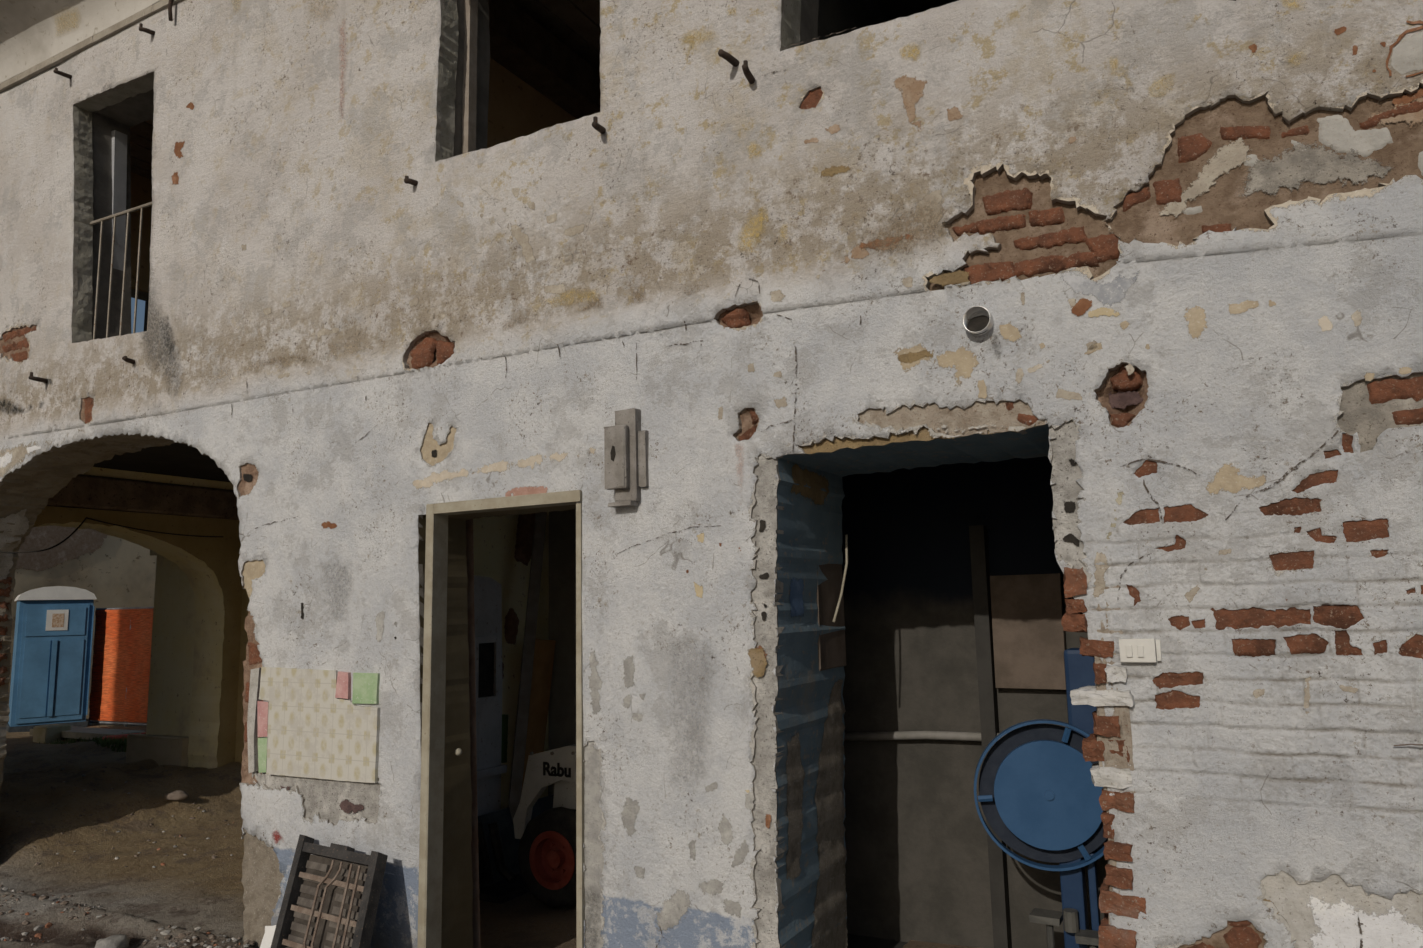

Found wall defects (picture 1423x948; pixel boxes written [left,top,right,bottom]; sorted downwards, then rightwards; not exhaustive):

flaking render [799,86,825,110]
peeling [892,75,927,132]
flaking render [901,79,1423,332]
flaking render [402,314,455,372]
flaking render [717,289,786,331]
flaking render [1259,367,1423,577]
peeling [0,508,107,686]
spalling [655,343,1208,948]
flaking render [1168,568,1423,659]
peeling [623,655,646,721]
peeling [621,797,640,836]
peeling [1156,870,1423,948]